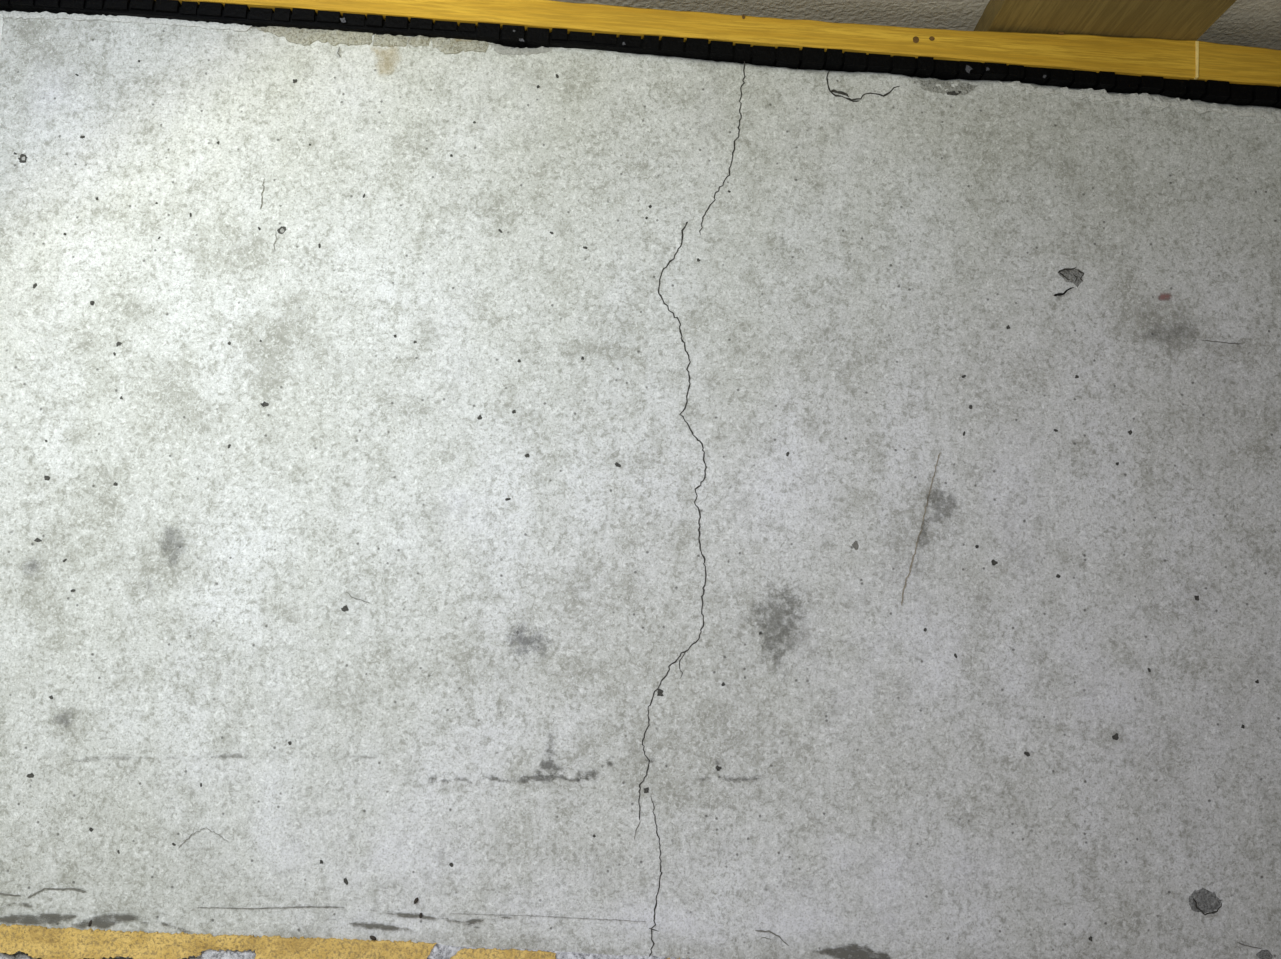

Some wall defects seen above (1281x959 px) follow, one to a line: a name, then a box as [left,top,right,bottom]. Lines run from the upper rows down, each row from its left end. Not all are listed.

crack [826,70,899,102]
crack [451,61,746,957]
crack [198,903,337,911]
peeling [0,924,436,959]
peeling [450,948,556,959]